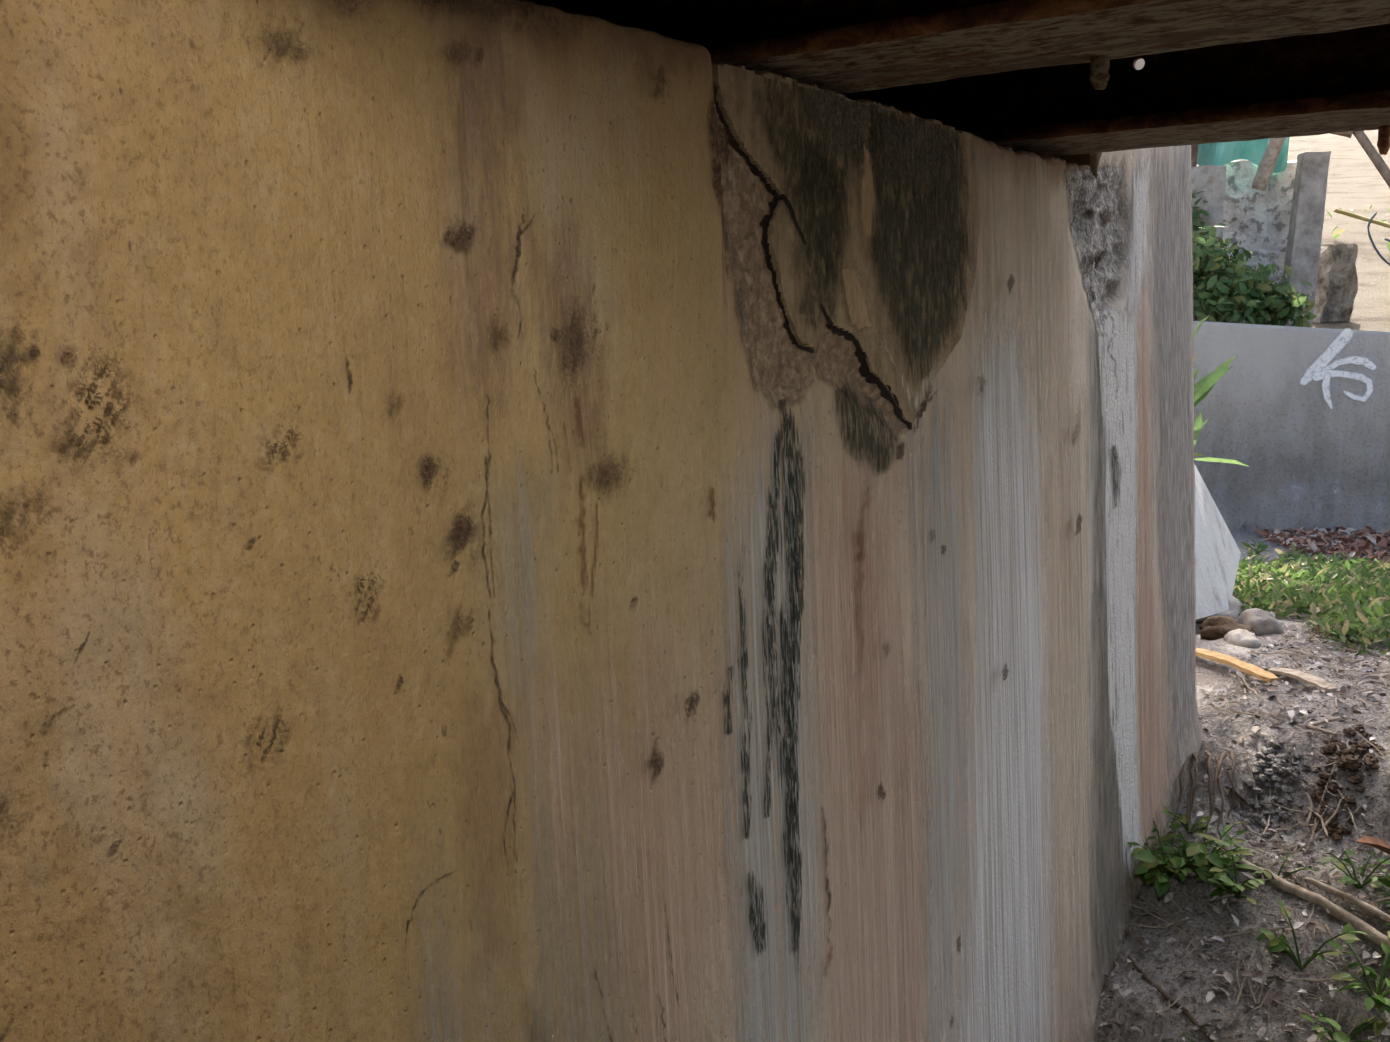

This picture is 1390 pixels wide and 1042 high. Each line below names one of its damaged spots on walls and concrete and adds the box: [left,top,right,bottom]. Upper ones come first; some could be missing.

damp [60,347,129,457]
crack [713,86,936,432]
flaking render [712,64,981,438]
damp [723,158,1055,1042]
peeling [1064,165,1142,884]
damp [602,728,719,1042]